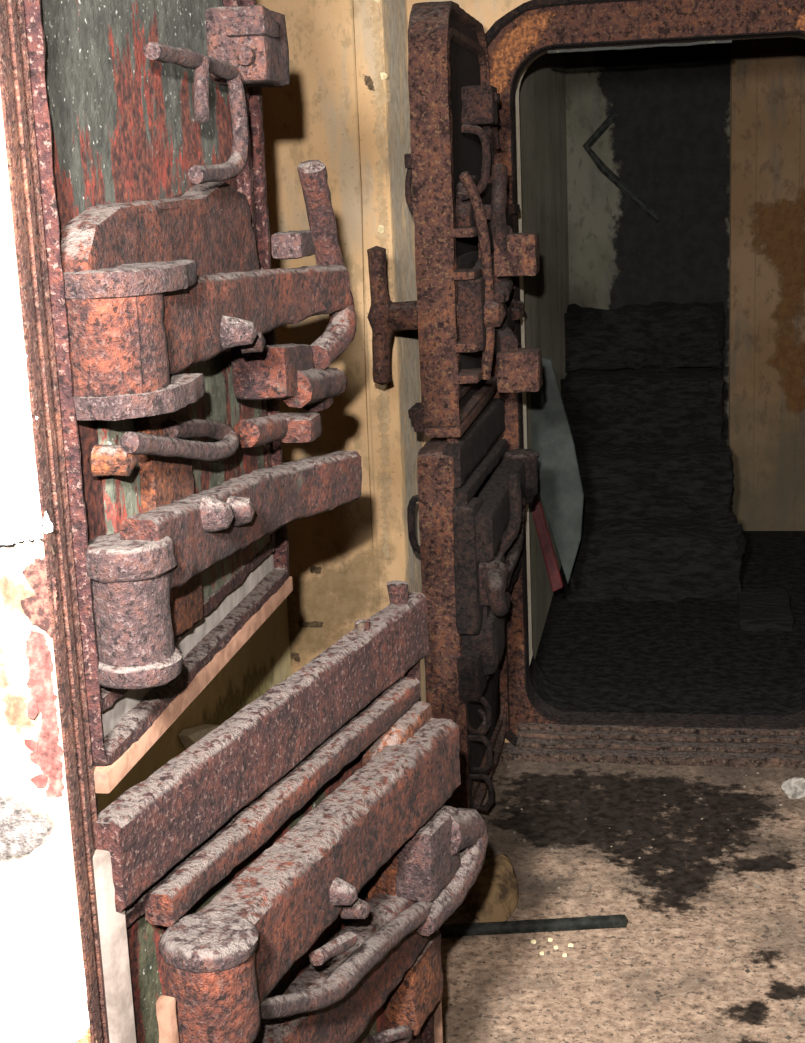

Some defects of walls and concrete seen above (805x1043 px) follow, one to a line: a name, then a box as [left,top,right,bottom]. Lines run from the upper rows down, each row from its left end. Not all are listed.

rust [489,12,555,105]
rust [781,8,805,31]
rust [752,189,805,412]
peeling [24,630,64,798]
damp [488,767,796,919]
damp [717,950,805,1025]
rust [78,1027,97,1043]